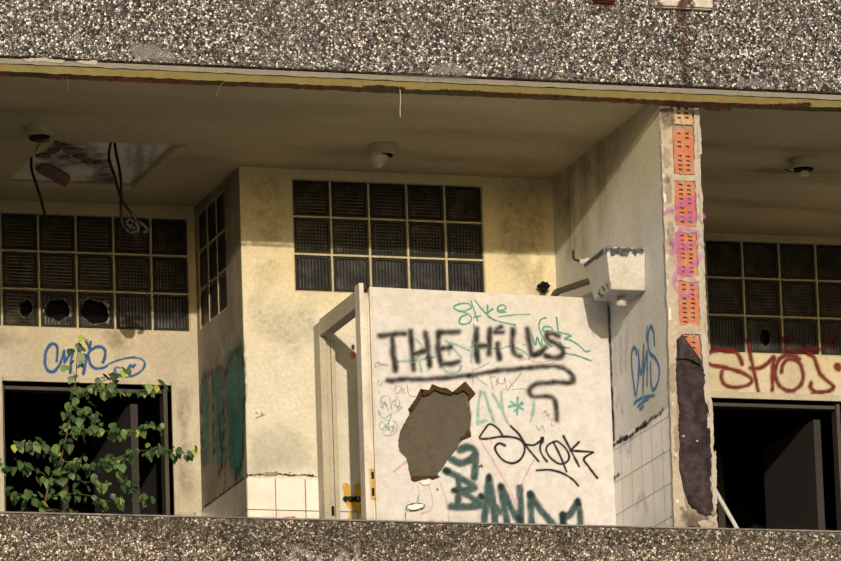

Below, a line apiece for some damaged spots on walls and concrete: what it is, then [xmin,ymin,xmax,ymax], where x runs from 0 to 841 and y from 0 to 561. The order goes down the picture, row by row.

corrosion [677,0,694,78]
spalling [34,140,115,184]
spalling [668,363,676,393]
spalling [408,382,476,411]
spalling [707,400,718,508]
spalling [411,475,441,485]
spalling [680,507,708,526]